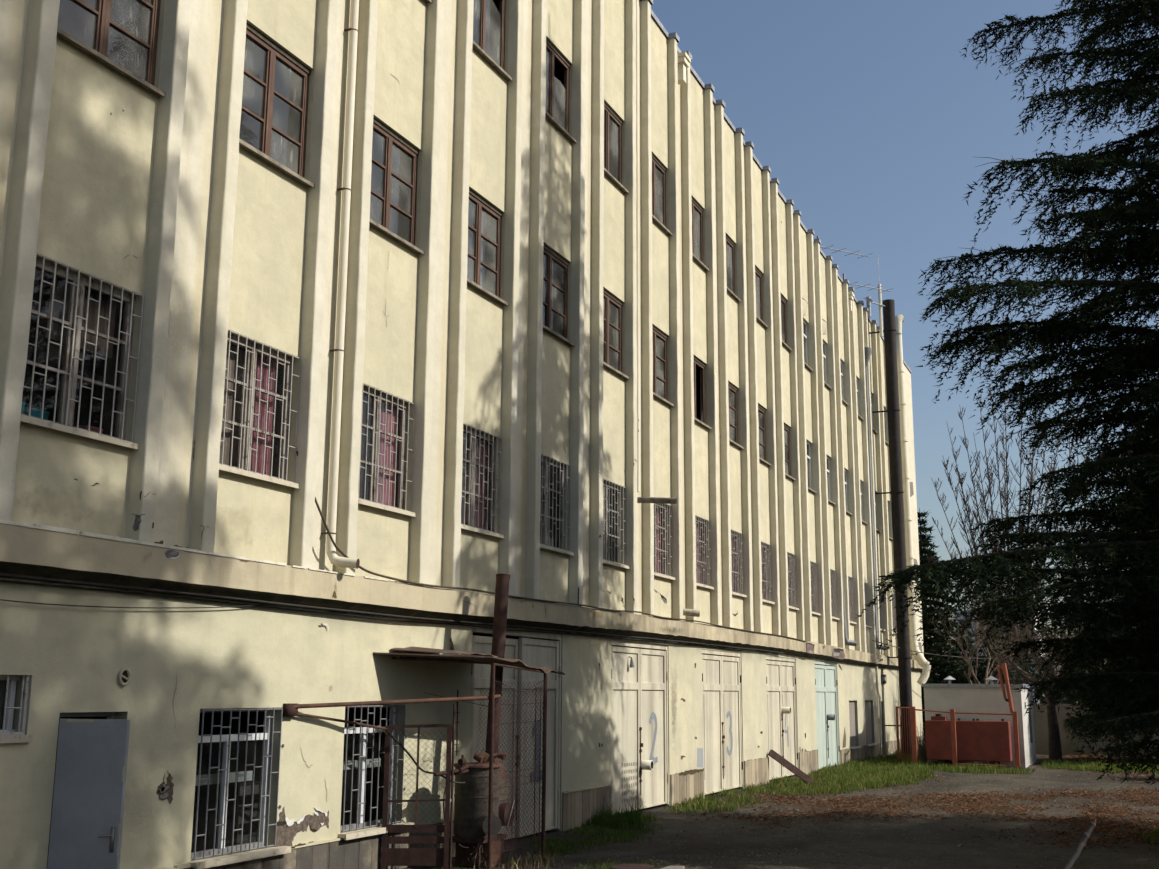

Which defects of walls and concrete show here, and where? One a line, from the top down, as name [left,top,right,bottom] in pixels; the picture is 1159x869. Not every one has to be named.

spalling [157,771,174,804]
peeling [275,806,329,847]